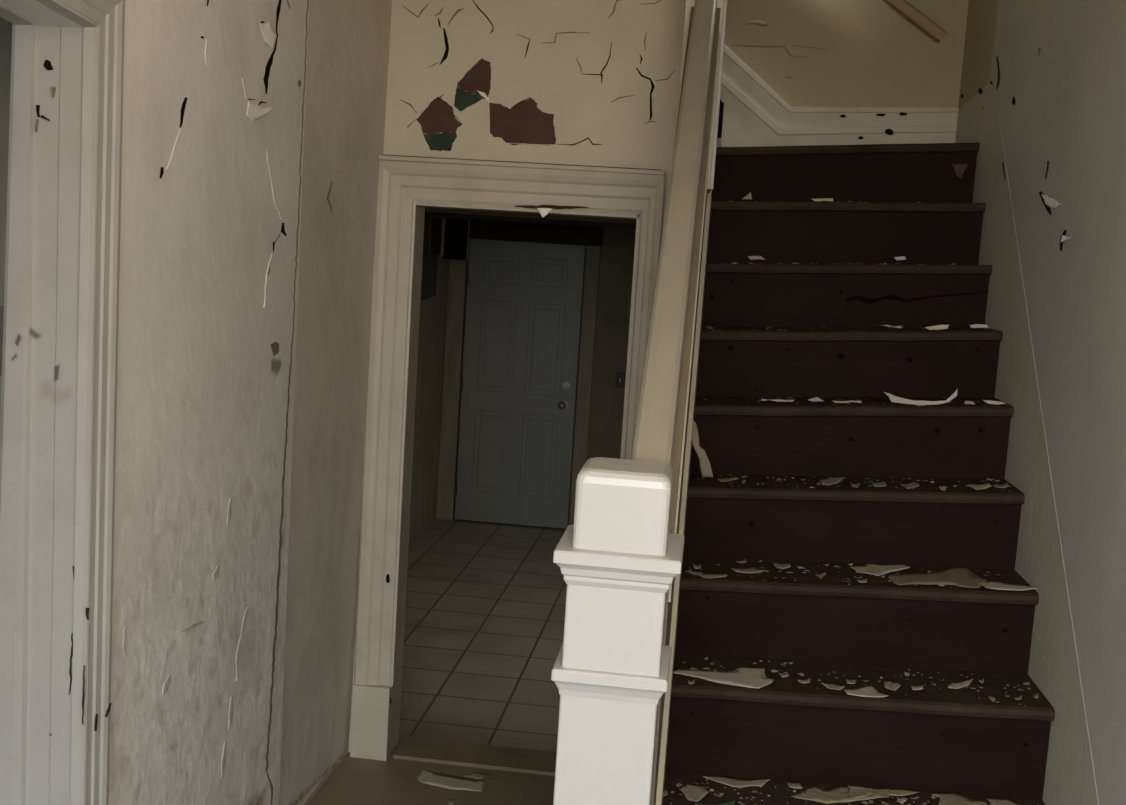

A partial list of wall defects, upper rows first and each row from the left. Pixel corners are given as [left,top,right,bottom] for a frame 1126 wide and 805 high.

crack [403,0,675,124]
peeling [242,78,275,122]
peeling [401,58,556,151]
crack [558,137,602,146]
peeling [1039,161,1062,215]